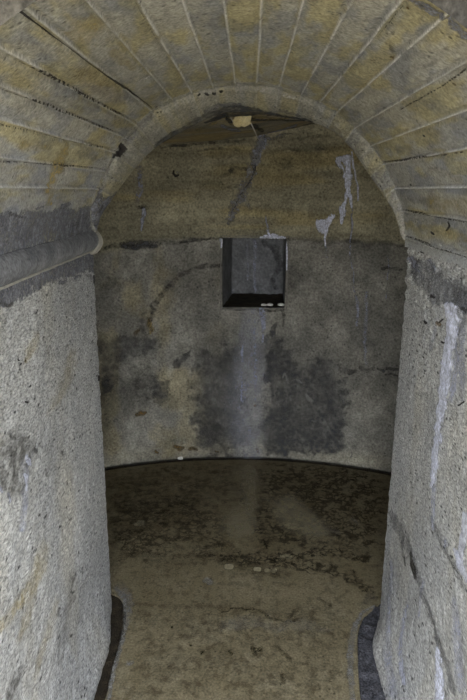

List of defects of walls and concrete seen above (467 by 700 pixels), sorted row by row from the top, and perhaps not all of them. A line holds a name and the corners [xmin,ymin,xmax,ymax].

spalling [112,115,152,158]
crack [226,118,314,225]
efflorescence [316,151,359,254]
water stain [407,256,467,492]
water stain [116,308,388,592]